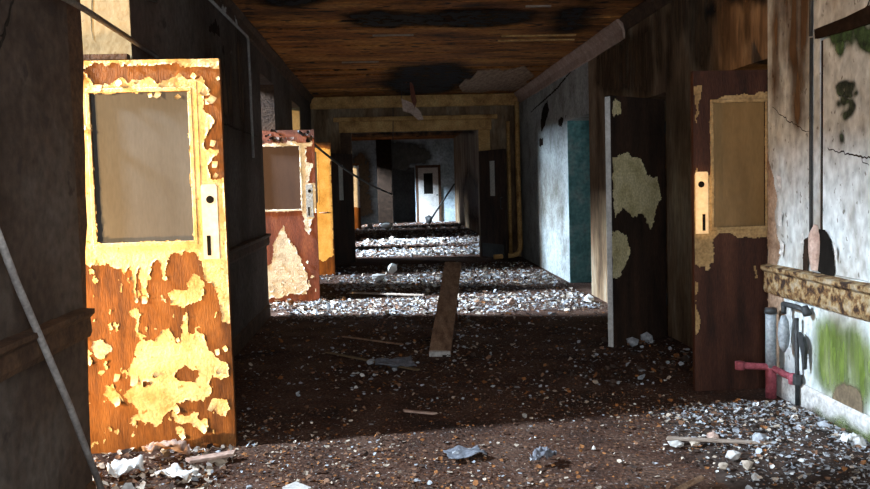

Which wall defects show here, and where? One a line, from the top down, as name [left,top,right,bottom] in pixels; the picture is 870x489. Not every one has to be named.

water stain [829,24,870,56]
peeling [612,99,621,116]
water stain [836,80,858,120]
crack [828,148,870,165]
peeling [264,140,334,262]
peeling [612,152,662,229]
peeling [83,19,230,440]
peeling [612,230,630,279]
water stain [832,383,863,413]